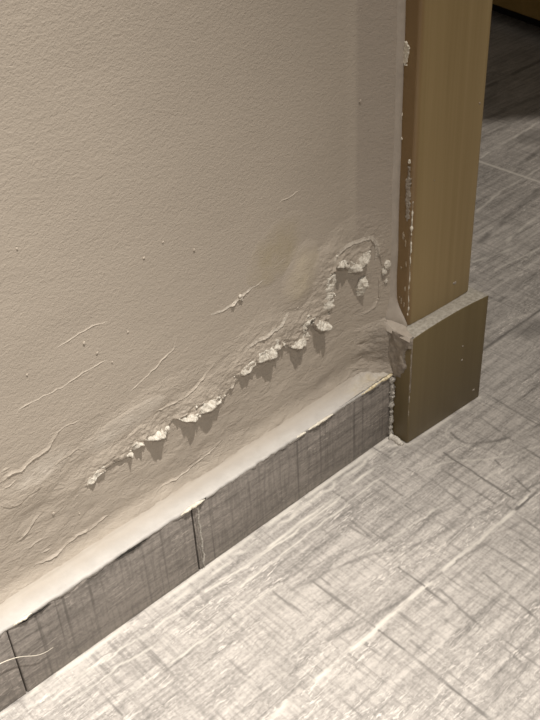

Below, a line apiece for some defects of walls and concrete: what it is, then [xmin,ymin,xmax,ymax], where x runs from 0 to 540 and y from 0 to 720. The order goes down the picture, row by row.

peeling [83,208,391,488]